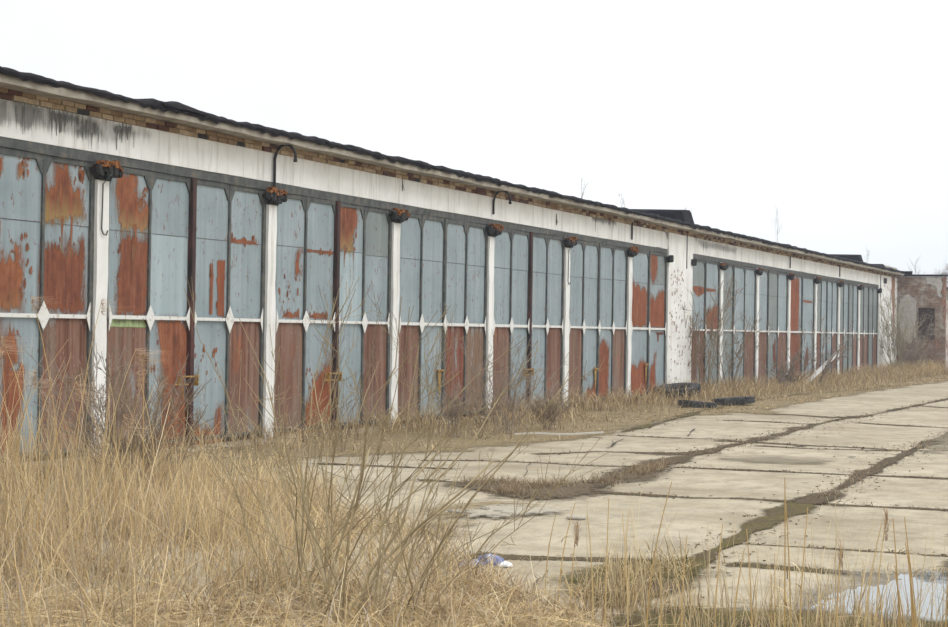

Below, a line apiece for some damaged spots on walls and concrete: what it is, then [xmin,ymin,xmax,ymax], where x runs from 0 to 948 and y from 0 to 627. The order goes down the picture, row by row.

leakage [46,108,99,149]
leakage [114,123,131,150]
corrosion [0,163,86,462]
corrosion [116,173,148,316]
corrosion [209,260,225,317]
corrosion [279,207,358,320]
corrosion [631,254,665,399]
corrosion [693,286,715,297]
corrosion [790,277,812,376]
flaking render [884,276,917,343]
corrosion [305,364,332,434]
corrosion [584,338,609,403]